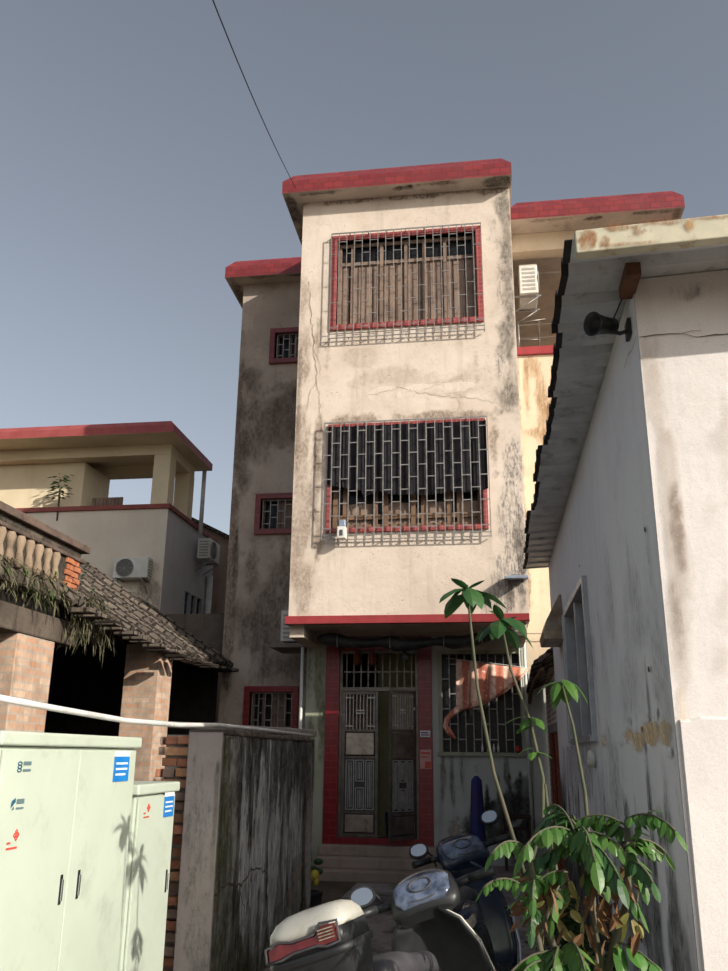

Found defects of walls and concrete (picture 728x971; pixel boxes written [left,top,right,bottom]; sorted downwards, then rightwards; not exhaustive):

crack [308,281,323,432]
crack [367,378,497,409]
crack [624,330,728,368]
damp [223,362,310,677]
damp [490,443,531,612]
damp [237,737,315,949]
damp [484,770,535,863]
damp [564,854,616,971]
damp [623,830,690,971]
flaking render [618,707,728,971]